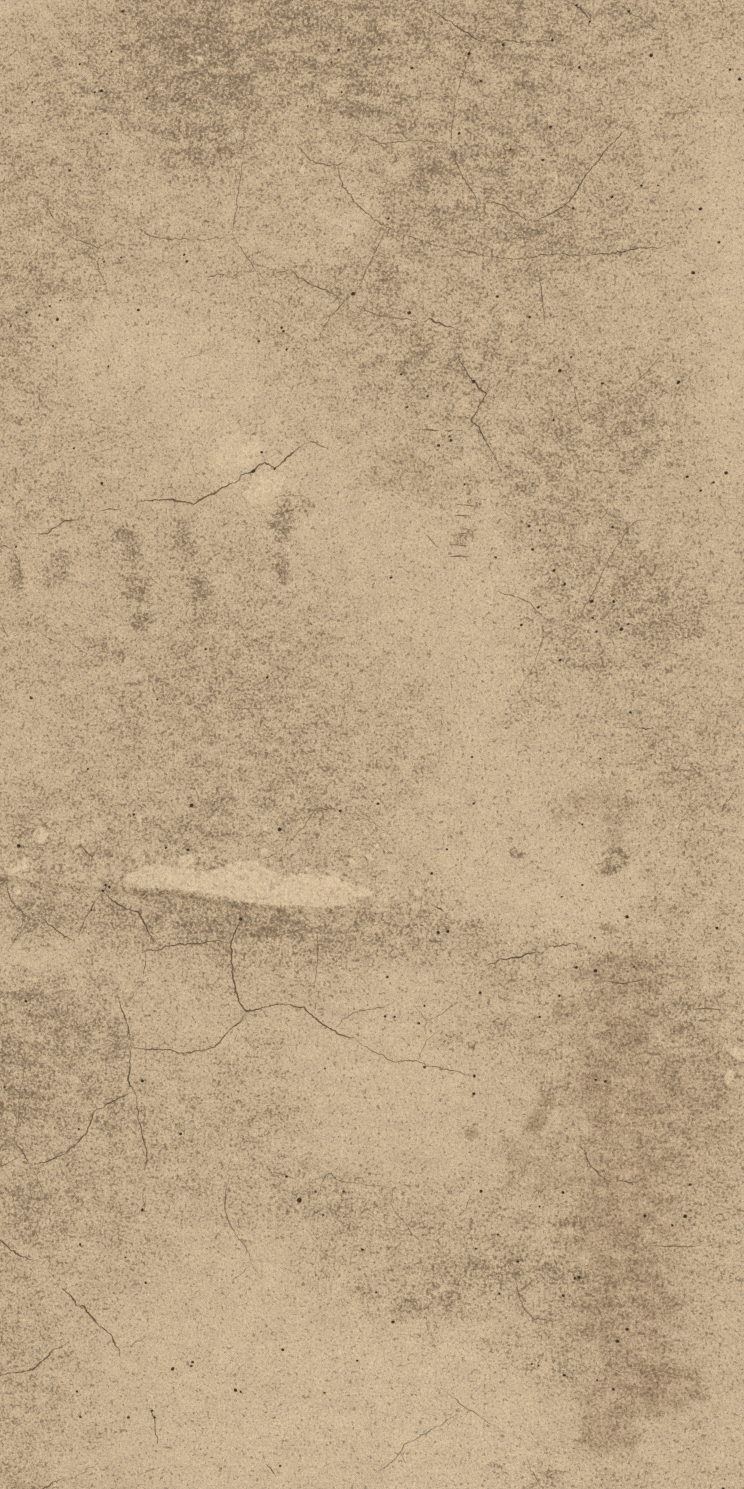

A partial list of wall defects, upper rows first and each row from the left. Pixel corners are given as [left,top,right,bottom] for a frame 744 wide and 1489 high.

crack [48,10,660,469]
crack [0,441,326,586]
peeling [118,824,389,911]
crack [0,844,472,1224]
crack [184,1176,258,1276]
crack [270,1172,421,1242]
crack [0,1287,140,1376]